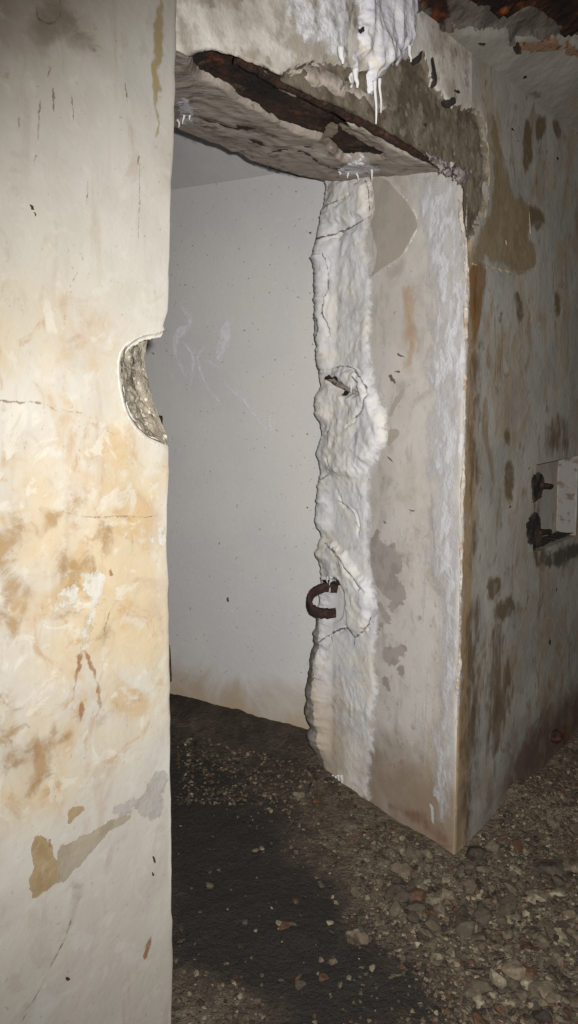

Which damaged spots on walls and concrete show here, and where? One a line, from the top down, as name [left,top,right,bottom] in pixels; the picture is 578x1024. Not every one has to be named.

corrosion [232,56,440,169]
corrosion [203,119,338,170]
spalling [264,51,536,276]
damp [523,117,561,169]
spalling [117,328,169,447]
damp [505,462,513,500]
damp [535,544,578,568]
damp [56,571,106,650]
damp [487,578,514,619]
damp [31,743,48,791]
peeling [29,771,168,898]